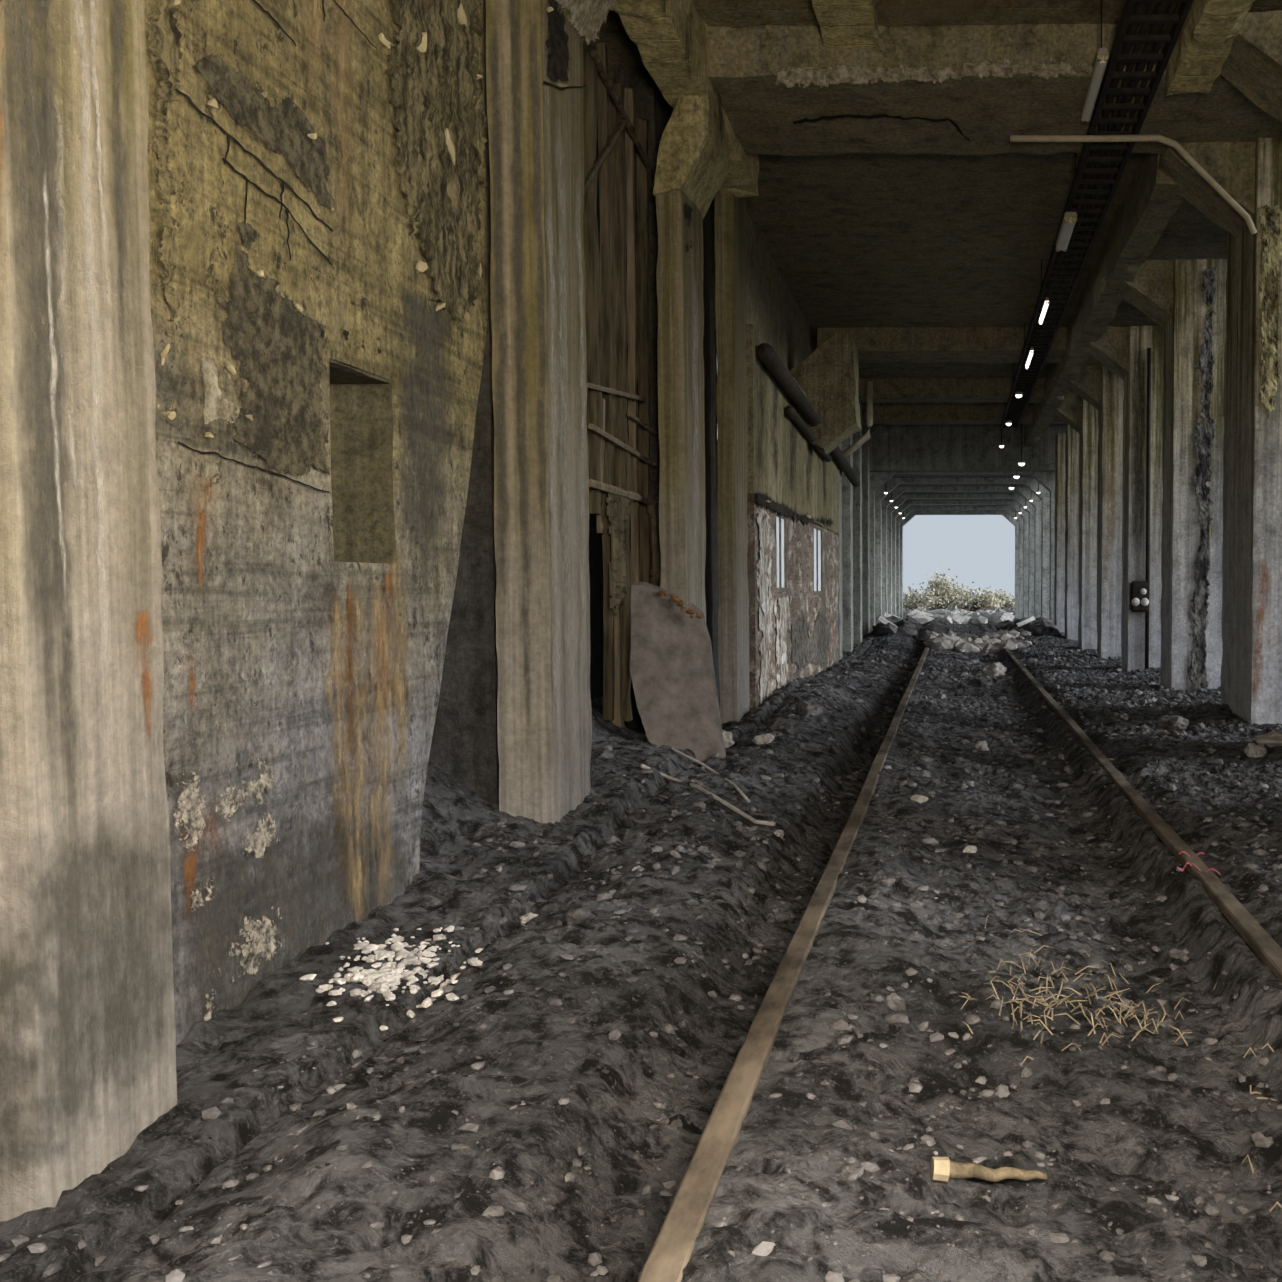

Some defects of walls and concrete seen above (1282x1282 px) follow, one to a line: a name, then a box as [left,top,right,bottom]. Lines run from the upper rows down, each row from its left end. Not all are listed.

peeling [147,0,335,368]
crack [175,88,333,265]
spalling [544,0,617,87]
crack [793,114,970,141]
leakage [10,0,76,759]
crack [177,441,330,493]
peeling [200,222,330,477]
spalling [1184,264,1217,691]
rust [330,563,406,877]
leakage [39,831,168,1115]
leakage [171,759,405,1022]
rust [340,851,362,908]